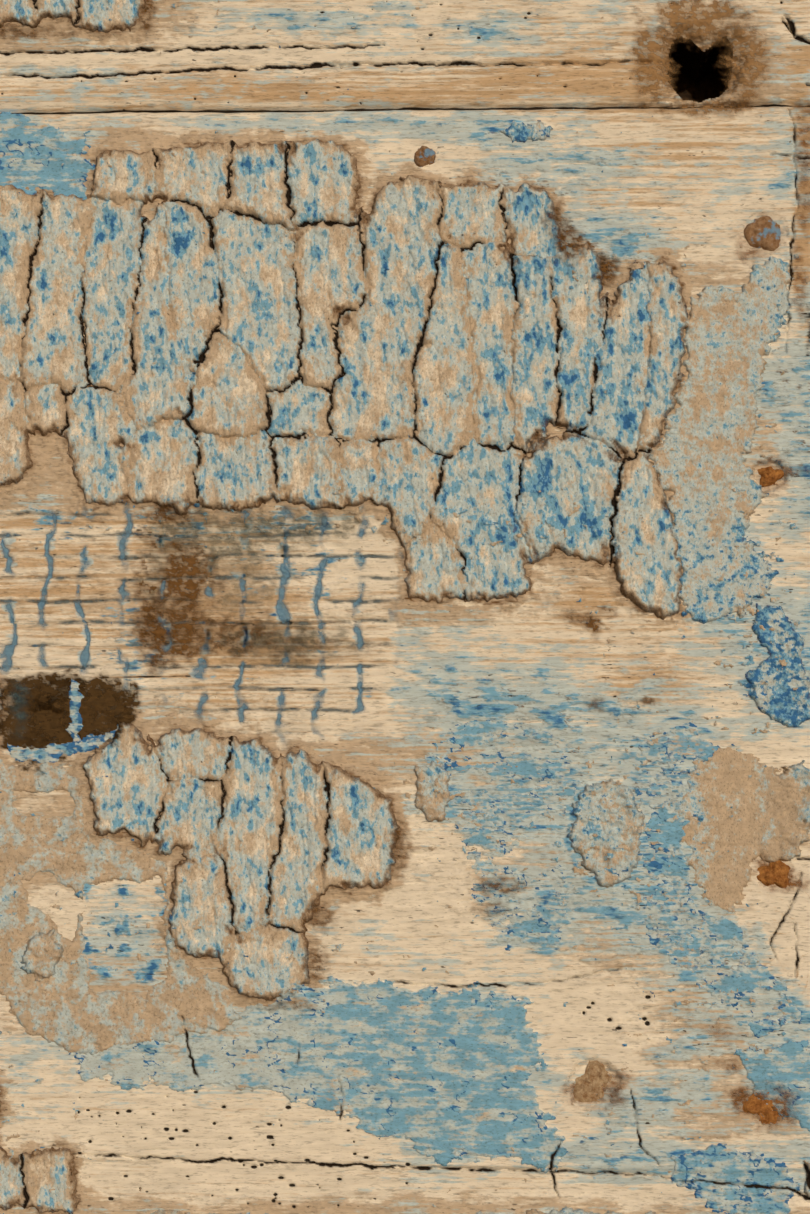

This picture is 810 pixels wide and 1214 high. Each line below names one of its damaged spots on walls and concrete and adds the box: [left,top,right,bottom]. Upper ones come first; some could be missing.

peeling [0,0,146,33]
leakage [633,0,767,115]
crack [782,18,810,44]
peeling [0,111,810,728]
crack [0,140,651,834]
leakage [136,503,321,666]
crack [221,777,300,935]
crack [321,770,331,867]
peeling [7,679,576,1172]
rust [733,1088,790,1121]
crack [20,1154,29,1208]
peeling [0,1146,81,1214]